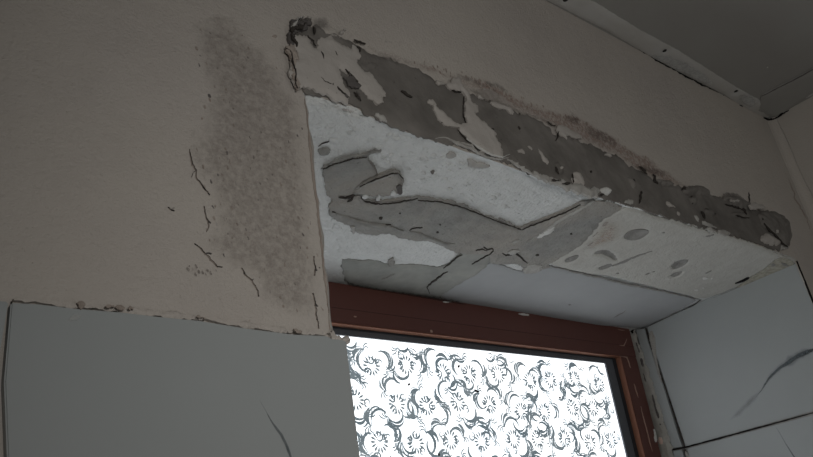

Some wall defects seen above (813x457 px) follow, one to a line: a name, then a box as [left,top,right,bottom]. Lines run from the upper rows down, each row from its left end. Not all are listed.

crack [189,149,259,297]
peeling [272,16,792,331]